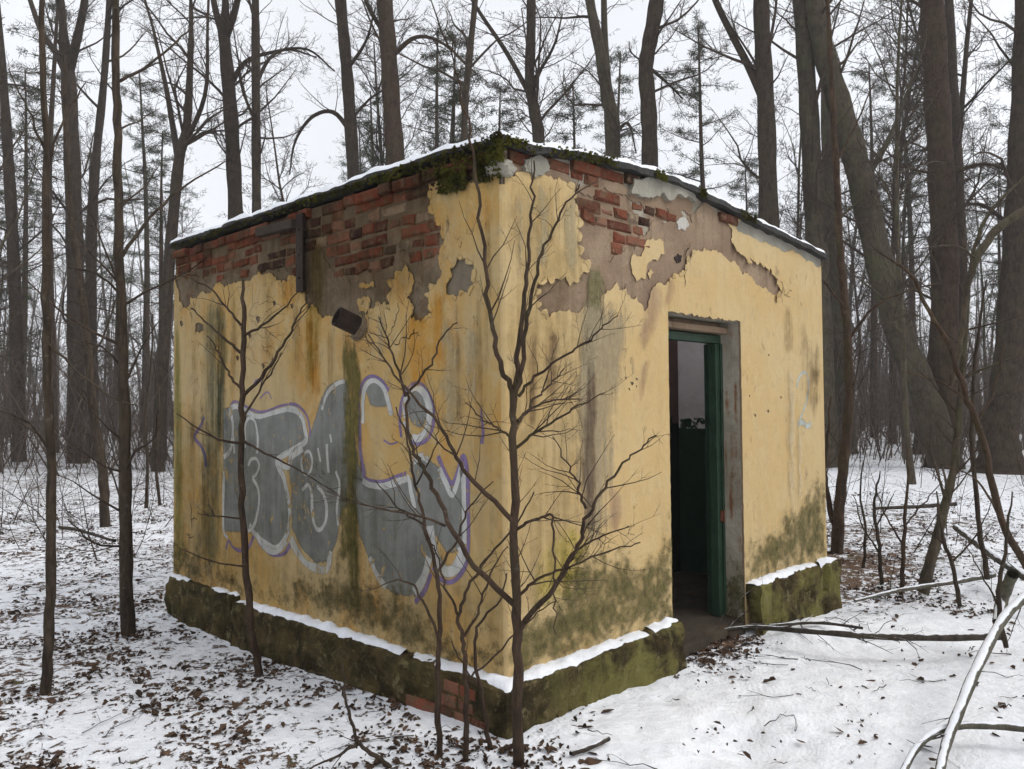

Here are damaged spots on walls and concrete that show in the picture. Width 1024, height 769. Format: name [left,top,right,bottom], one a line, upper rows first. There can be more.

flaking render [176,169,497,326]
flaking render [535,158,821,320]
leakage [340,341,362,610]
flaking render [406,679,485,730]